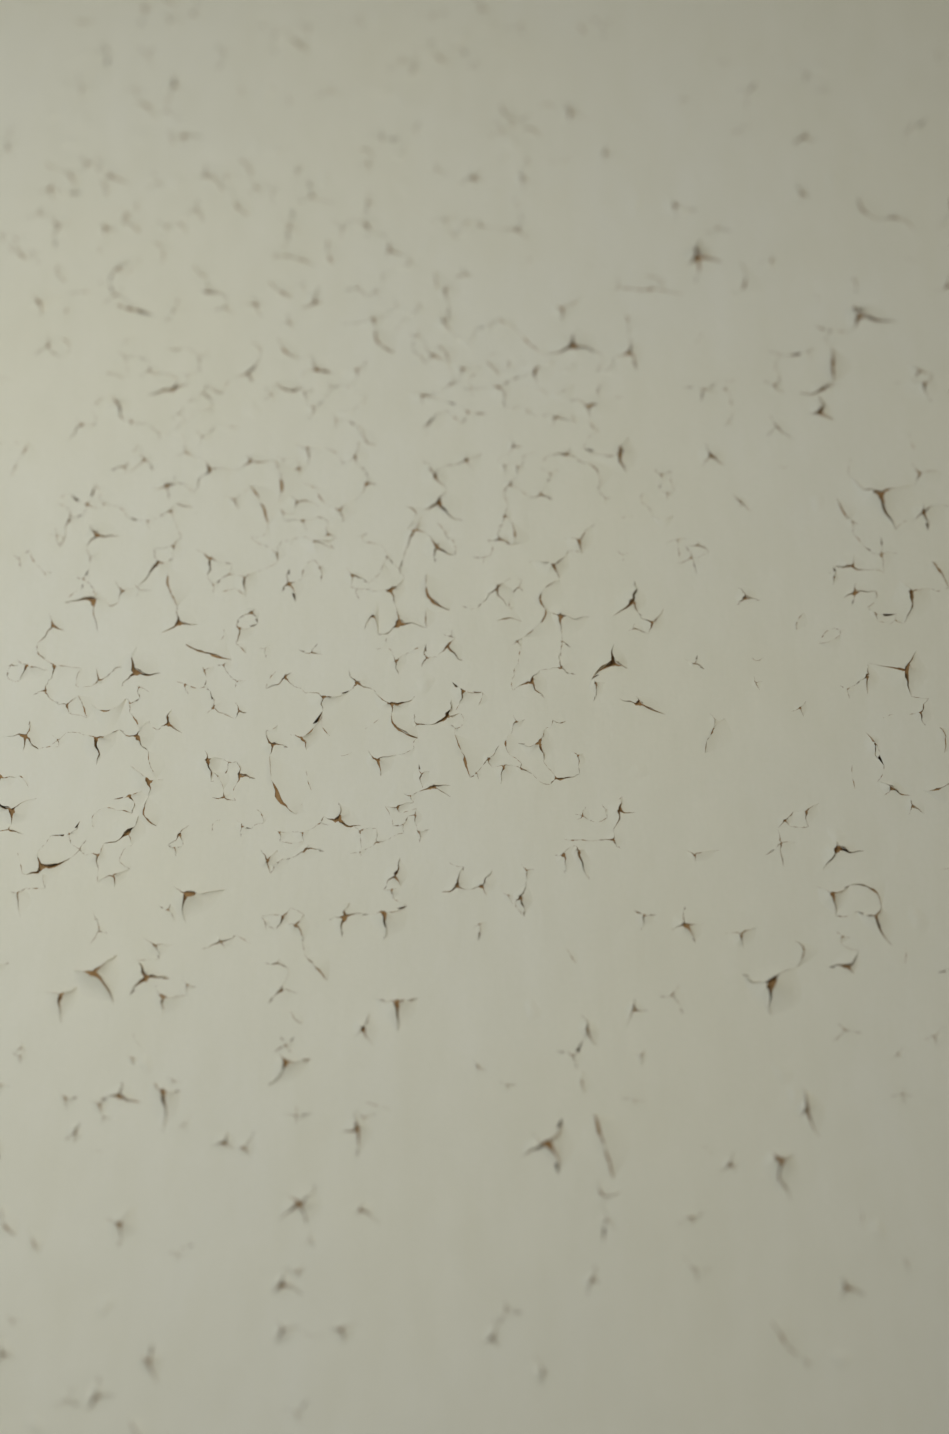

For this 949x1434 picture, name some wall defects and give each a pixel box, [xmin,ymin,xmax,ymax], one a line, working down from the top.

peeling [402,451,481,562]
peeling [849,469,948,530]
peeling [17,550,173,714]
peeling [260,570,463,755]
peeling [589,644,628,700]
peeling [0,767,36,838]
peeling [11,709,182,917]
peeling [169,876,225,921]
peeling [330,858,407,939]
peeling [817,840,894,944]
peeling [45,937,187,1020]
peeling [353,991,418,1045]